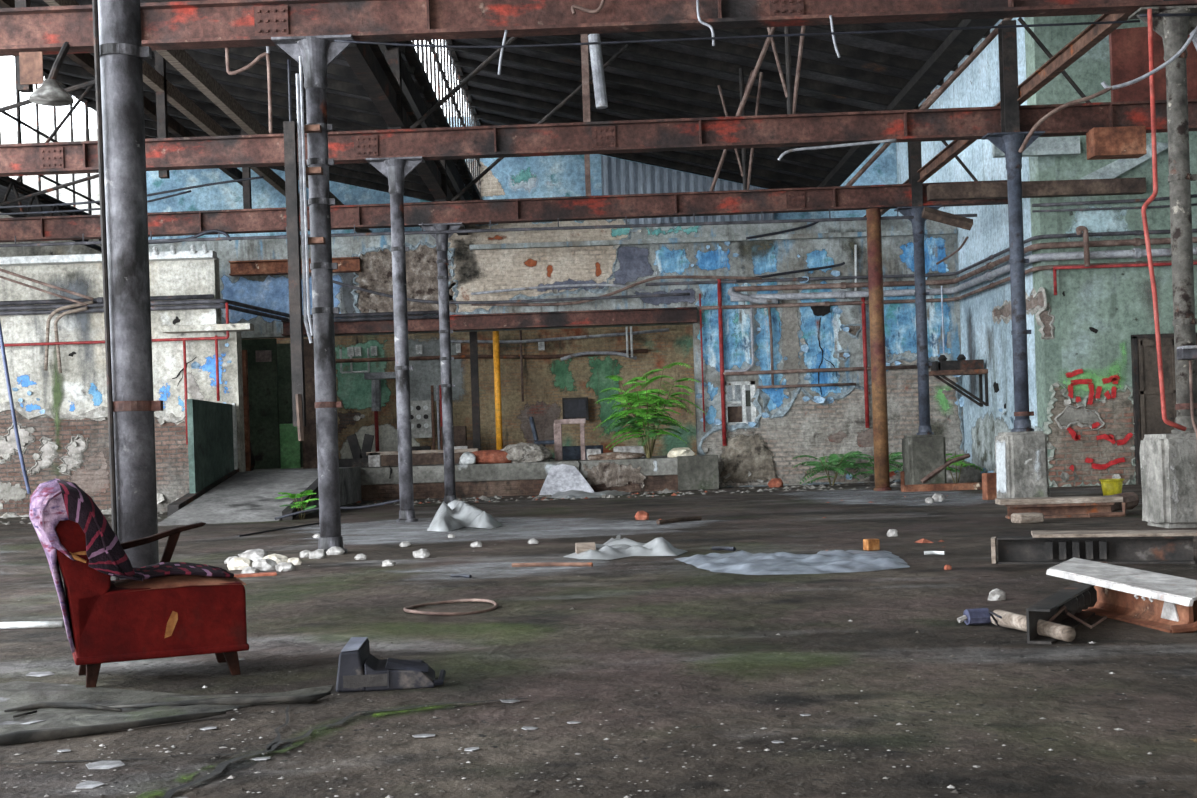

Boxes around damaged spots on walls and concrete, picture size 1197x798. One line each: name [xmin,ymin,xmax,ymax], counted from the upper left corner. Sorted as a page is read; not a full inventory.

water stain [42,341,63,444]
spalling [0,374,111,518]
water stain [50,274,92,360]
spalling [154,343,232,513]
peeling [220,275,313,323]
spalling [333,219,1012,489]